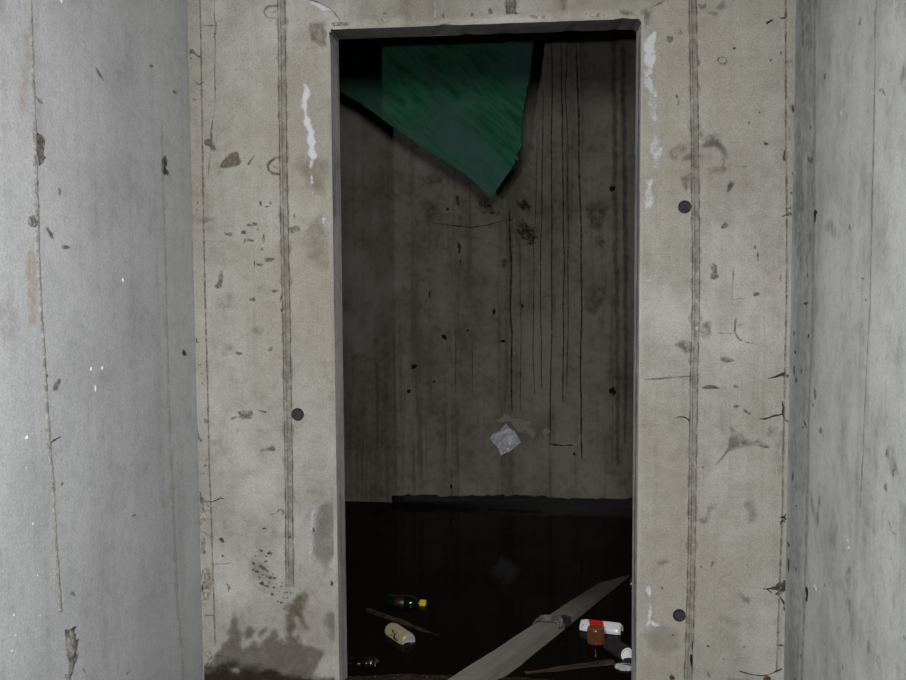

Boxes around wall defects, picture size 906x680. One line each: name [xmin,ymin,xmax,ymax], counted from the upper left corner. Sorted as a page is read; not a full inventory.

leakage [301,83,317,194]
leakage [637,179,654,208]
leakage [638,31,663,168]
leakage [216,596,322,676]